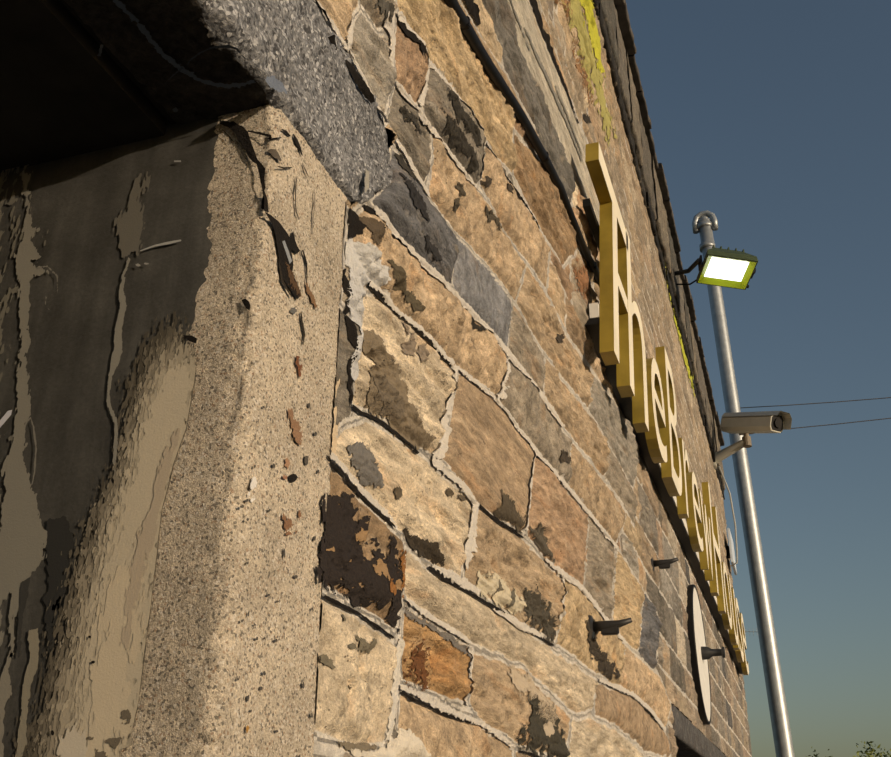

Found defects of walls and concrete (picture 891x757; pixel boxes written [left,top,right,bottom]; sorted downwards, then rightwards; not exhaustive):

water stain [511,0,583,162]
spalling [265,212,300,314]